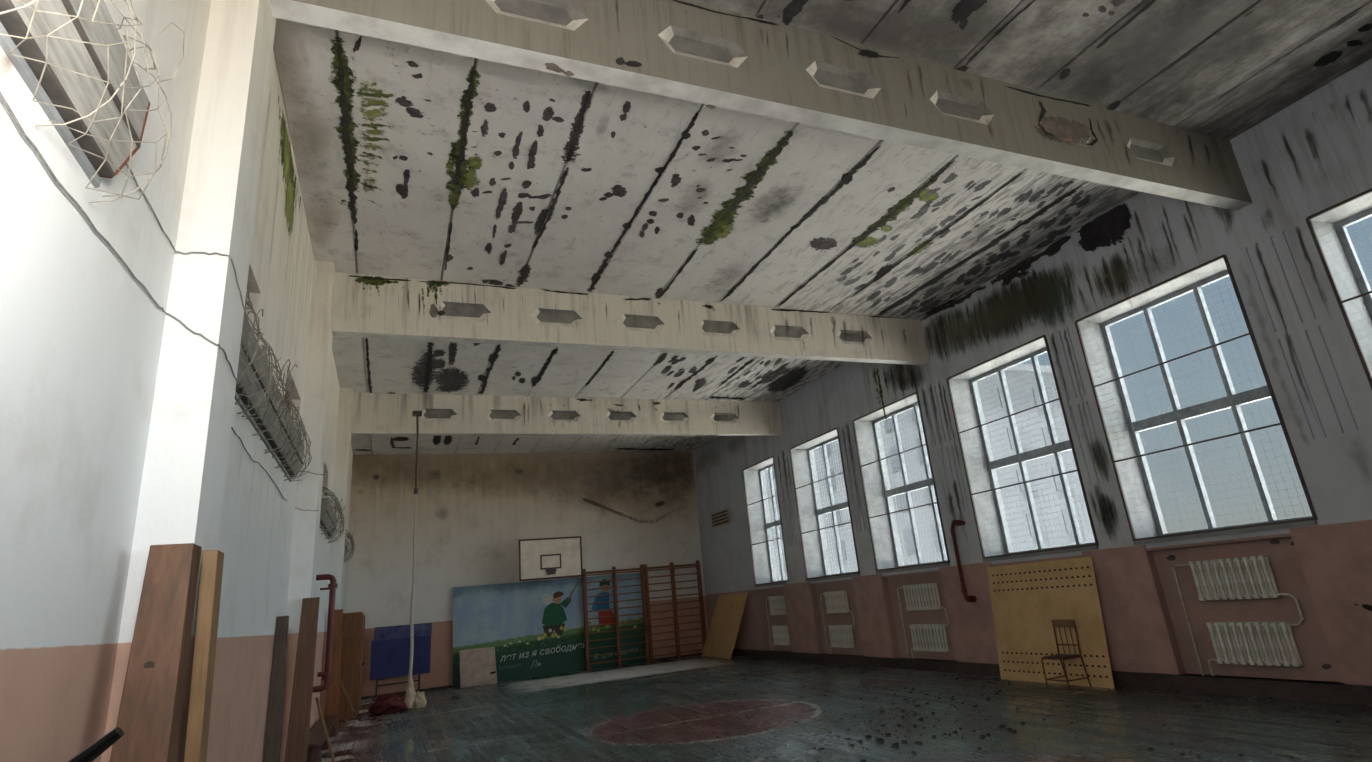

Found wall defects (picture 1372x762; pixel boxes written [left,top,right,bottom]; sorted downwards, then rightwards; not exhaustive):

damp [279,113,301,212]
damp [337,45,406,251]
damp [427,71,474,210]
damp [720,131,793,221]
damp [809,237,837,252]
peeling [837,173,1133,316]
damp [920,217,1098,321]